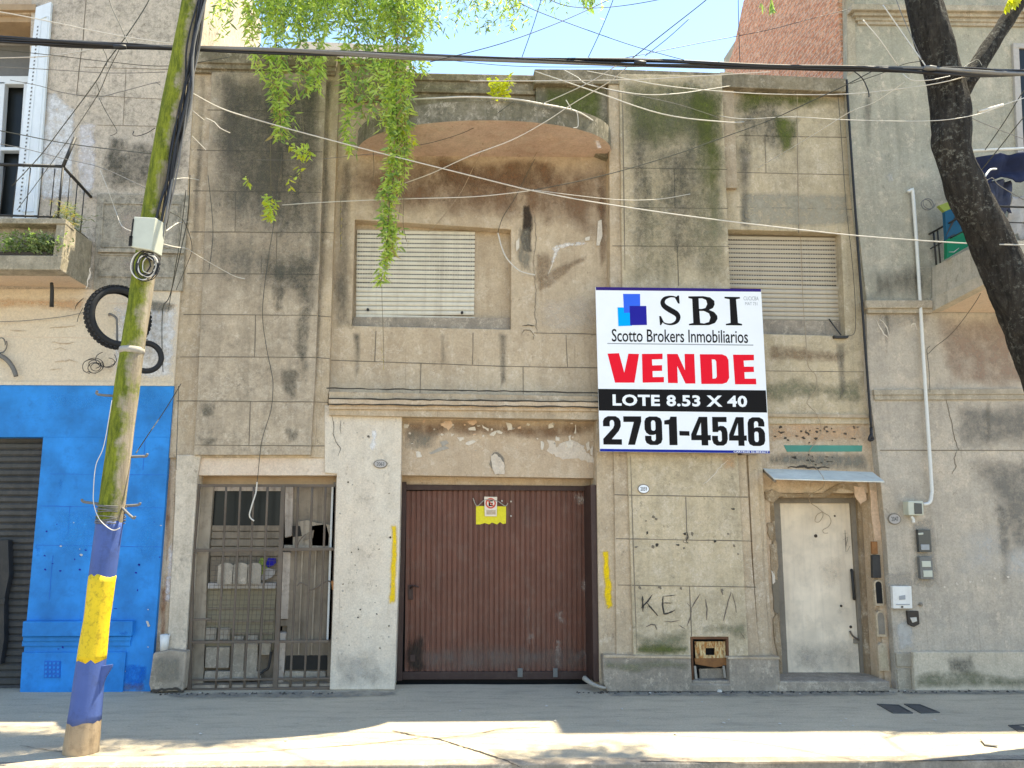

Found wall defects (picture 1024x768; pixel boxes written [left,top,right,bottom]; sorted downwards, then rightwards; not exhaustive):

damp [223,81,331,214]
damp [743,93,817,149]
damp [637,93,722,264]
damp [363,162,604,290]
spalling [489,452,505,475]
peeling [404,420,593,463]
peeling [774,426,859,443]